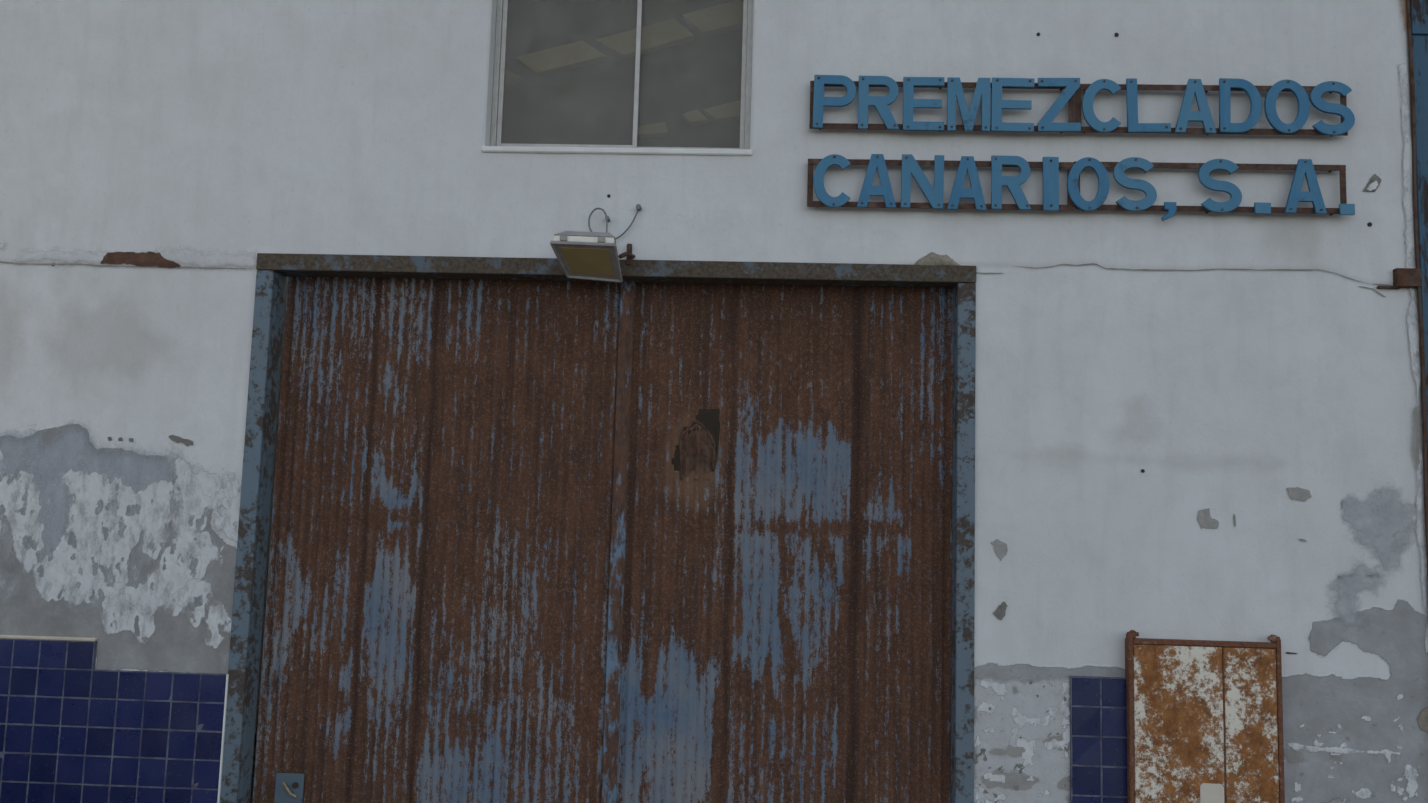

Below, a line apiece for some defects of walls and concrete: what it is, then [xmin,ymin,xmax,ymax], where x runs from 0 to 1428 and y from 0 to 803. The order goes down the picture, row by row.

spalling [1363,174,1381,192]
peeling [1399,64,1416,268]
peeling [0,422,242,674]
peeling [991,539,1008,561]
peeling [993,602,1007,620]
peeling [1197,509,1219,529]
peeling [1282,288,1428,803]
peeling [974,663,1125,803]